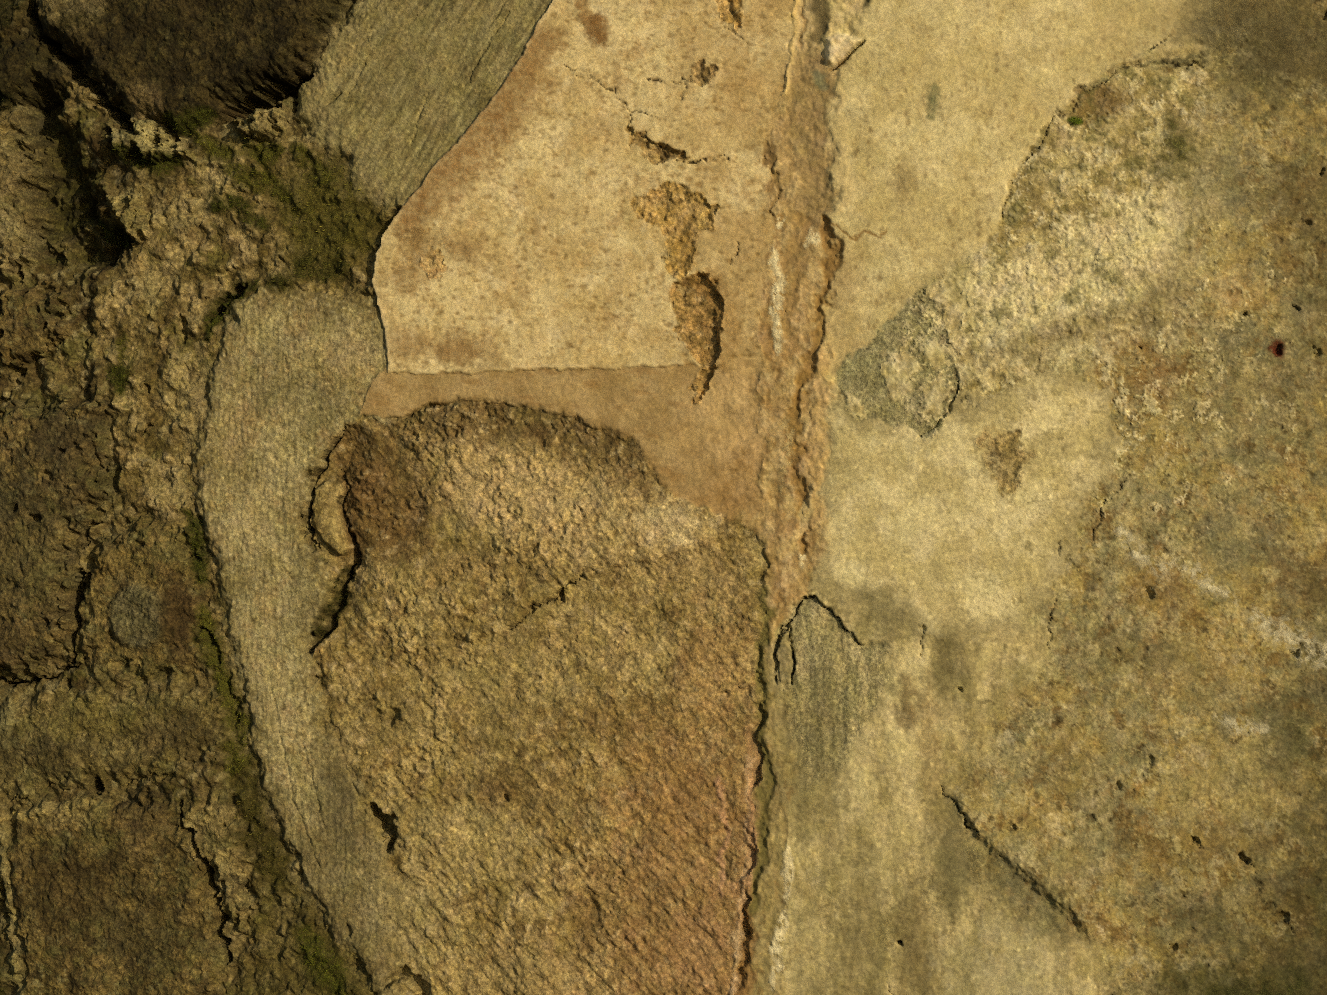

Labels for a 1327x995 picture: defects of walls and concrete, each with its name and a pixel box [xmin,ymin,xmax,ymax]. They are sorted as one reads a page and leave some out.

spalling [716,0,744,33]
spalling [625,121,690,165]
spalling [630,181,726,405]
crack [310,439,362,578]